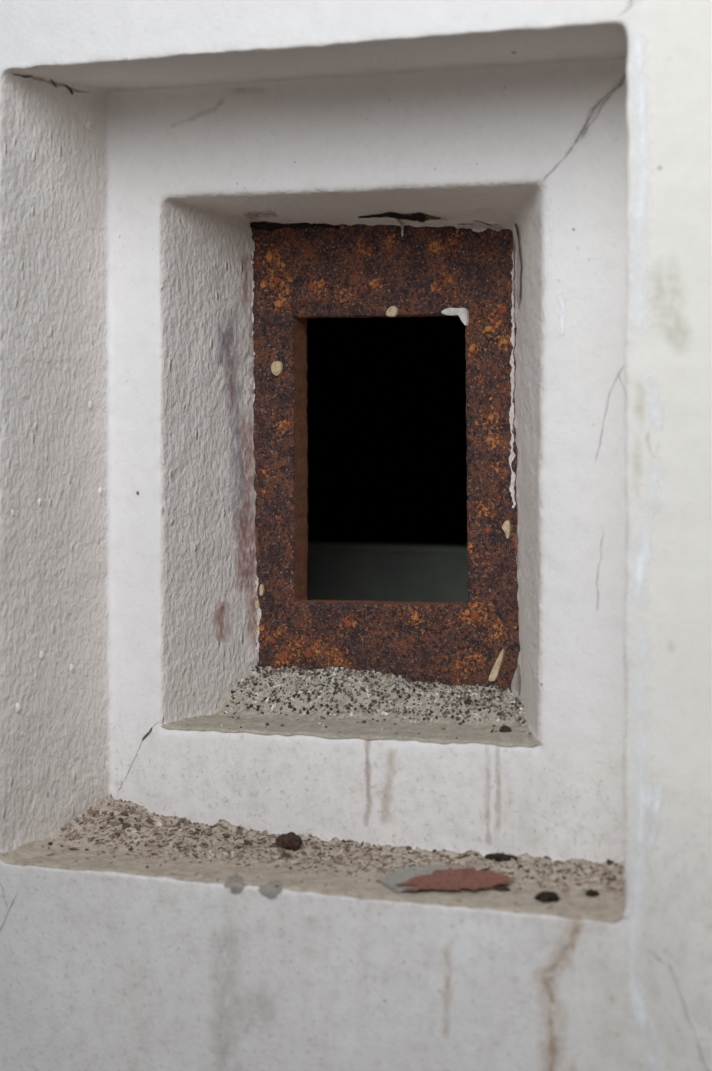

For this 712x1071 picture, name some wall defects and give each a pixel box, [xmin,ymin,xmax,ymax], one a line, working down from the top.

crack [15,74,73,95]
damp [627,731,663,1071]